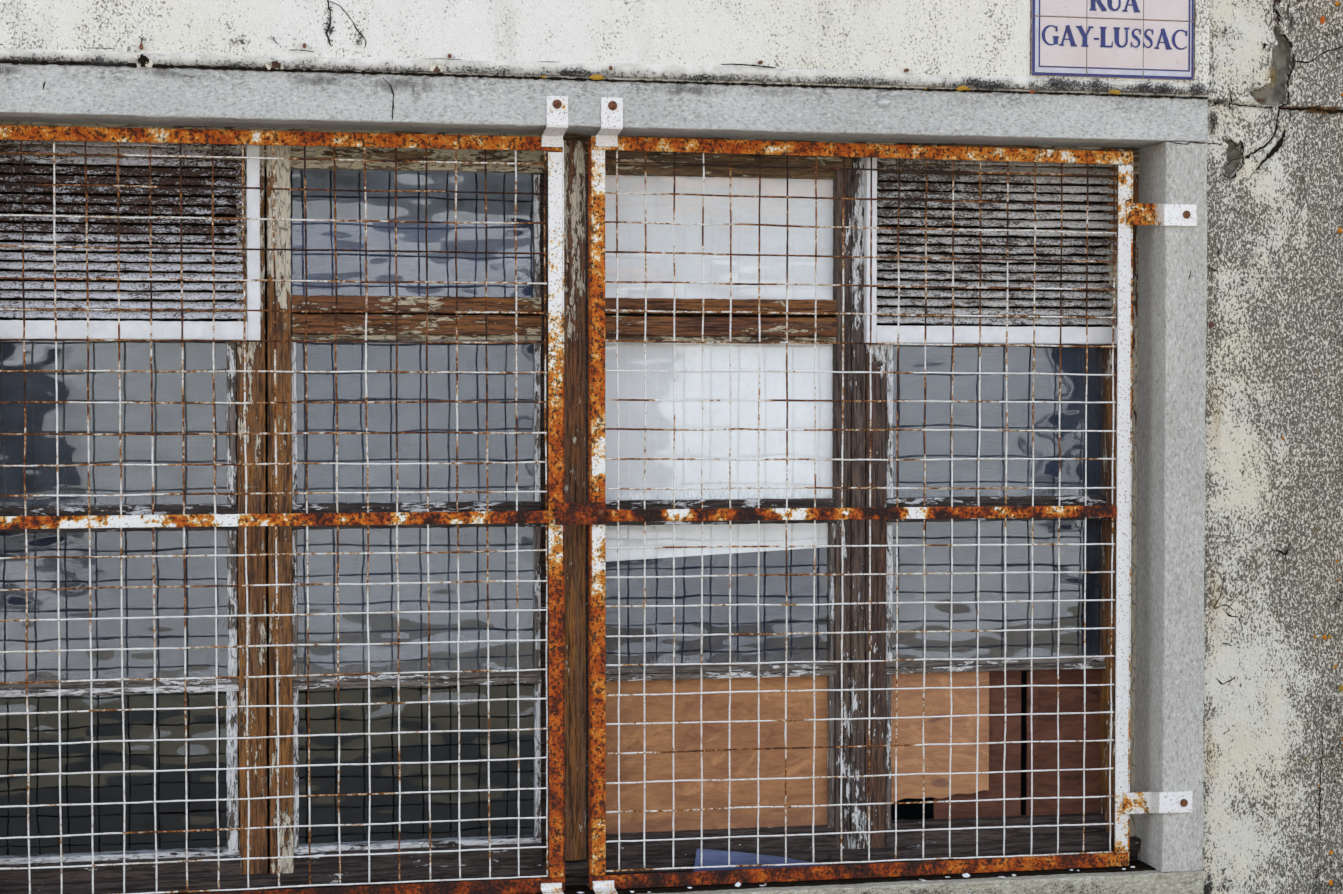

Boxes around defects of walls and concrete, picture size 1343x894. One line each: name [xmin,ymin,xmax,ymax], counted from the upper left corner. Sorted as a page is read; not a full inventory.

spalling [1250,0,1300,113]
crack [0,0,1343,231]
spalling [1220,130,1285,179]
leakage [1319,581,1343,805]
leakage [1204,866,1240,894]
leakage [1306,856,1343,894]